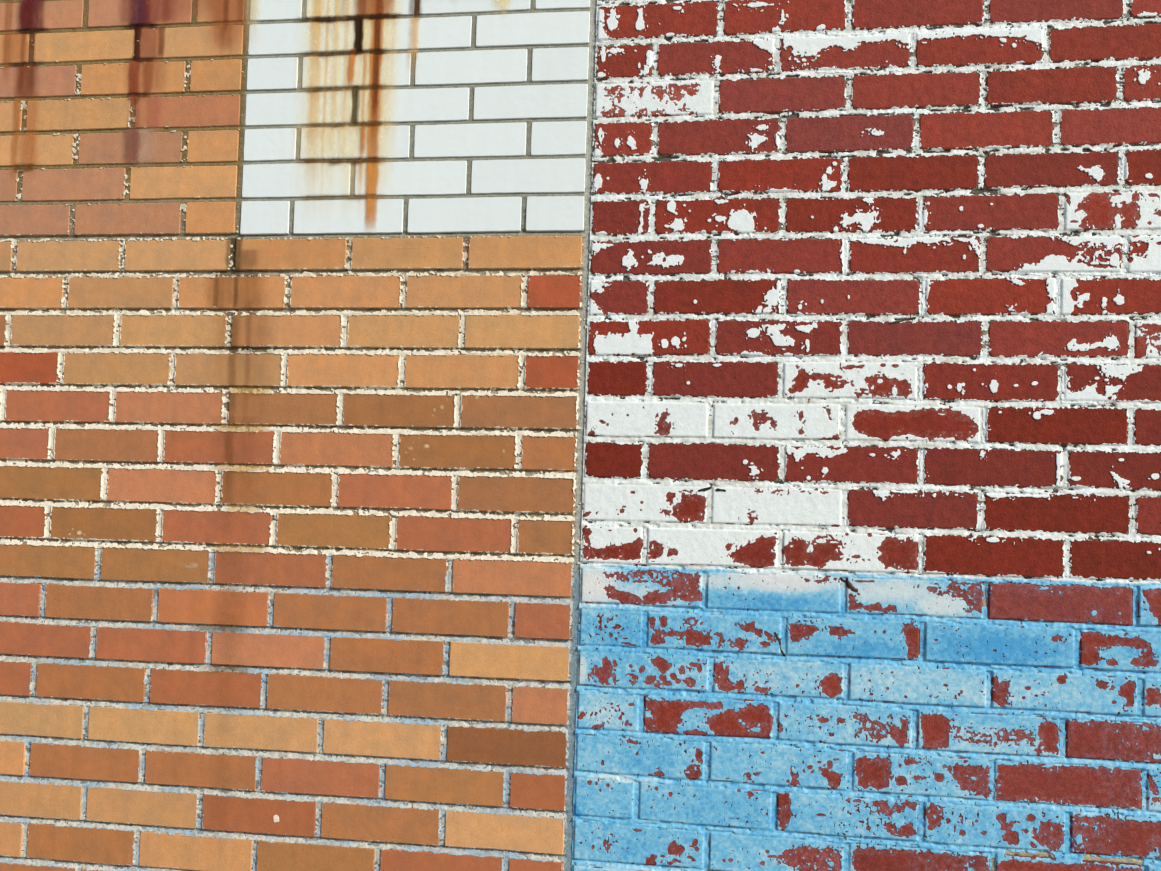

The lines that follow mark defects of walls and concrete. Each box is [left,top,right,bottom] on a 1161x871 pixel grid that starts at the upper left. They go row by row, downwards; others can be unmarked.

rust [302,0,419,222]
peeling [593,0,700,192]
peeling [733,0,1047,75]
peeling [588,279,690,385]
peeling [622,249,684,271]
peeling [833,197,984,277]
peeling [730,269,1103,507]
peeling [1006,148,1161,319]
peeling [1028,322,1161,419]
peeling [660,490,707,523]
peeling [577,511,855,780]
peeling [725,509,1161,871]